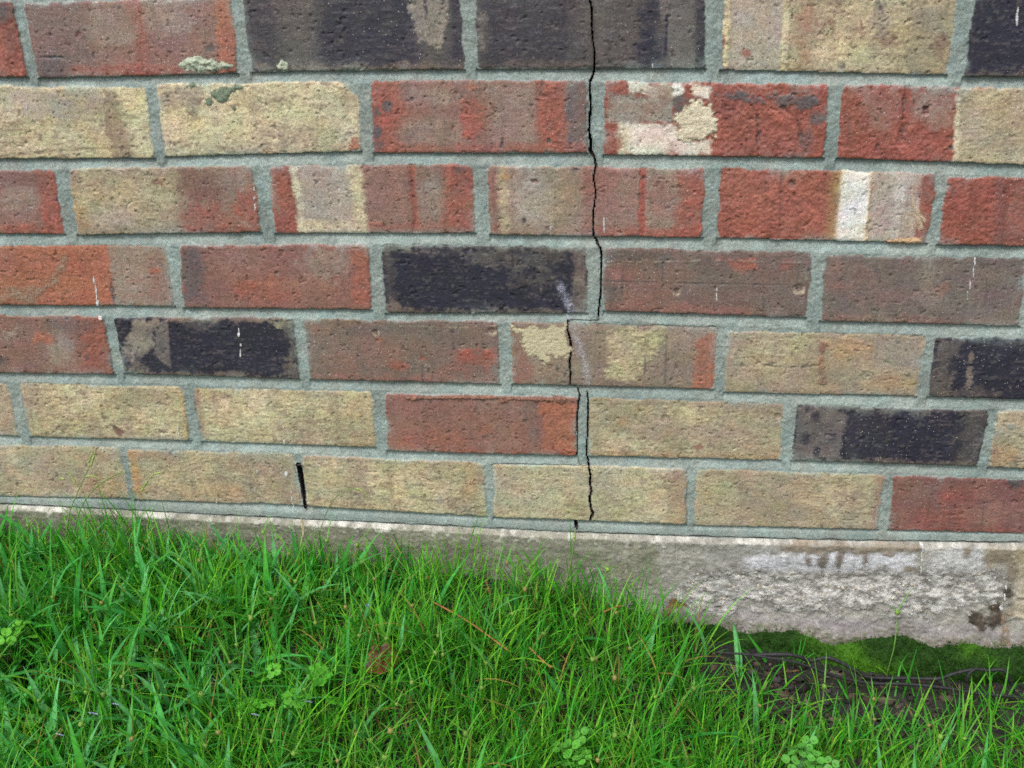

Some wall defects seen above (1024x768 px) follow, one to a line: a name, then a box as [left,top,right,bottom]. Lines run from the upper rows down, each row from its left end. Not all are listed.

crack [1,0,1023,543]
leakage [783,541,920,568]
leakage [969,551,1018,631]